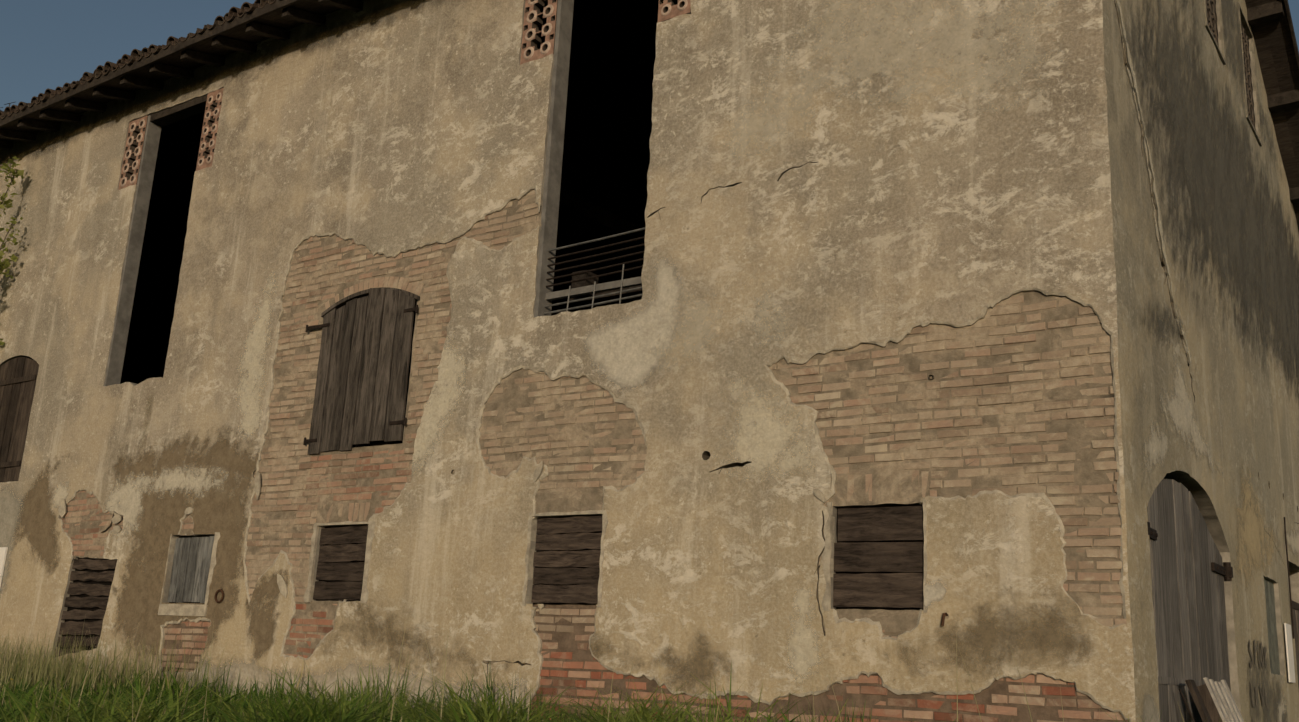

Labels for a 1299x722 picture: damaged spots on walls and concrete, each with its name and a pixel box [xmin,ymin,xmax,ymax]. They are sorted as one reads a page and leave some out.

crack [1114,0,1195,403]
leakage [1127,0,1299,393]
leakage [14,462,69,571]
spalling [58,489,123,563]
leakage [106,274,288,659]
spalling [243,185,542,660]
spalling [476,365,647,519]
spalling [765,287,1127,629]
spalling [159,617,211,676]
spalling [482,604,1131,722]
spalling [818,593,922,640]